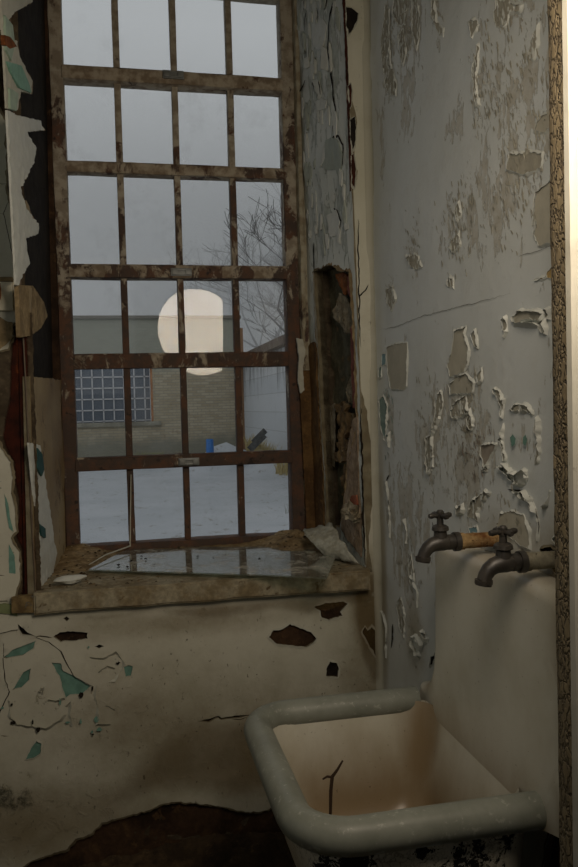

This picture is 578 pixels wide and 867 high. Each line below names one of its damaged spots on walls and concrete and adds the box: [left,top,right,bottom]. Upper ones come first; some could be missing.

peeling [380,0,445,102]
peeling [436,0,551,289]
peeling [500,306,552,339]
spalling [296,262,358,529]
peeling [378,325,555,668]
crack [0,603,20,629]
peeling [3,625,37,658]
spalling [54,616,133,682]
spalling [266,622,318,649]
spalling [313,599,349,621]
spalling [325,659,341,679]
peeling [1,662,117,761]